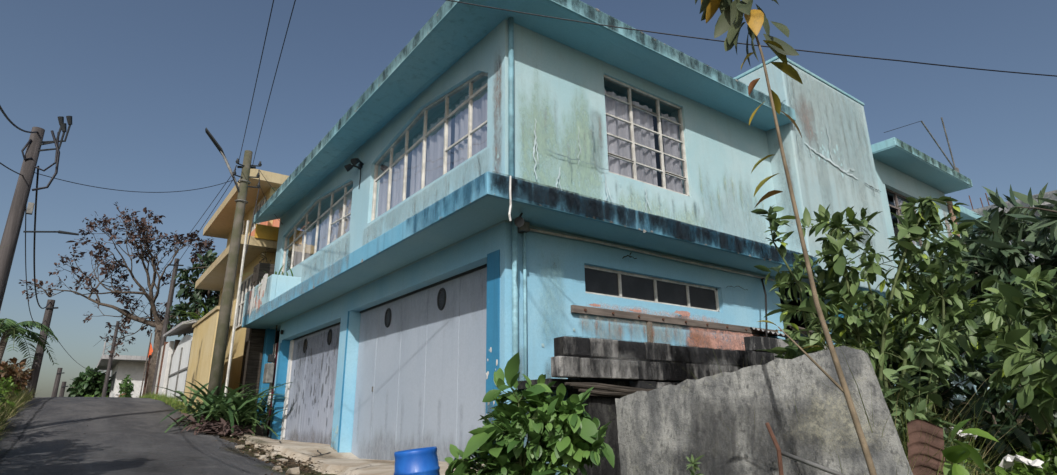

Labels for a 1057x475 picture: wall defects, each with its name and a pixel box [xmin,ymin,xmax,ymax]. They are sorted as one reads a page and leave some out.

water stain [445,105,818,265]
crack [0,397,53,462]